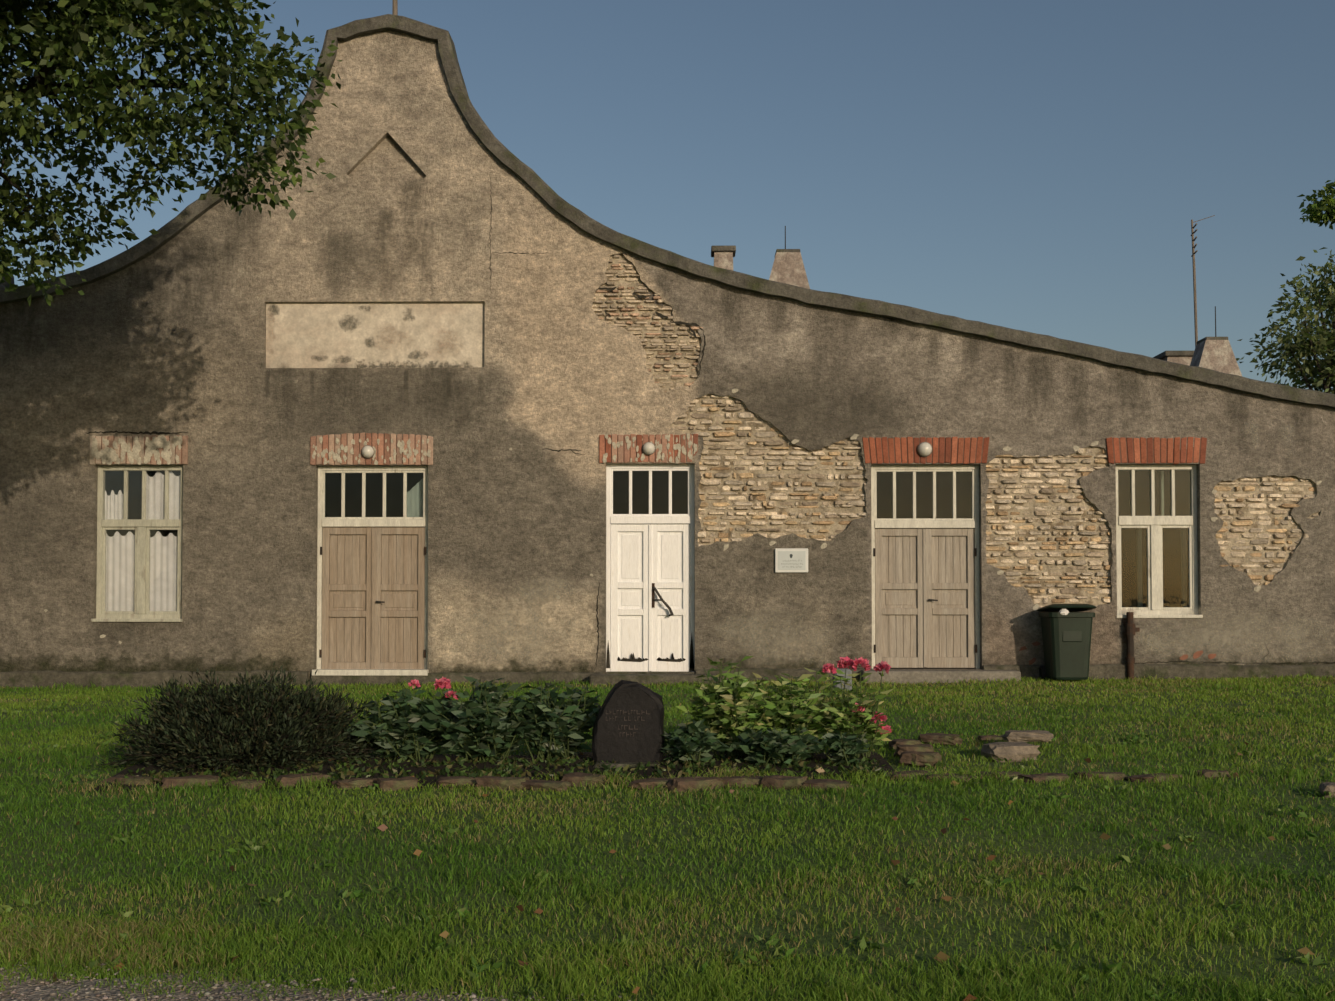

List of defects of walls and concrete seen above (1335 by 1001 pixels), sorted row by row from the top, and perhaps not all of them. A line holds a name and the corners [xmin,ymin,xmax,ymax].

peeling [91,435,182,465]
peeling [312,436,431,465]
spalling [592,253,868,551]
spalling [985,441,1113,611]
spalling [1211,475,1322,592]